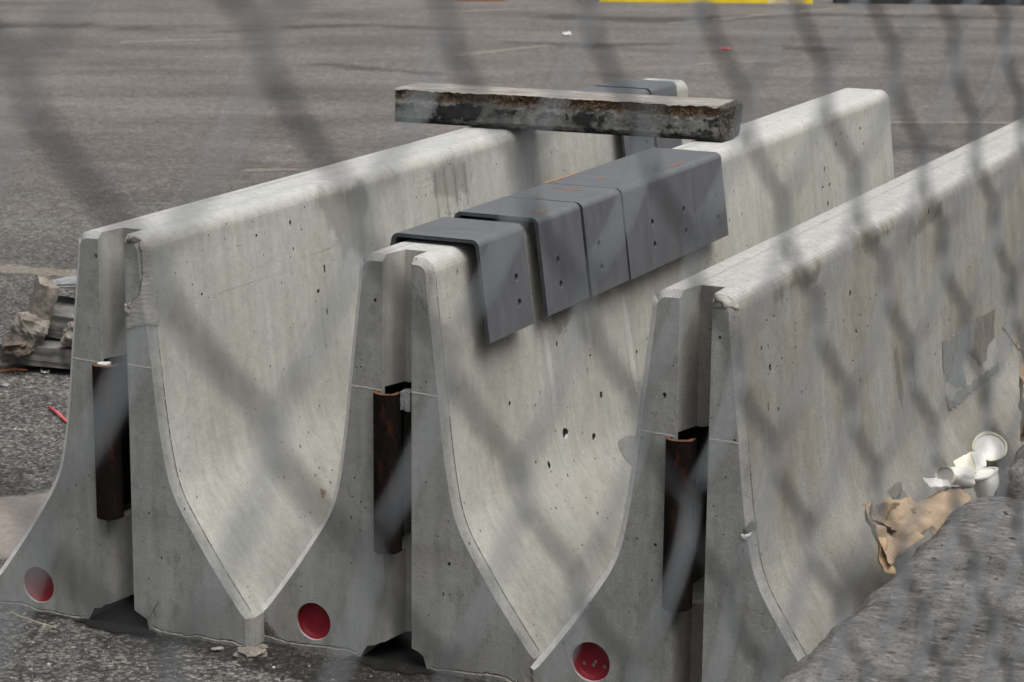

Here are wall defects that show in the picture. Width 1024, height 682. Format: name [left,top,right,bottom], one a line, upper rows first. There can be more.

peeling [943,309,995,410]